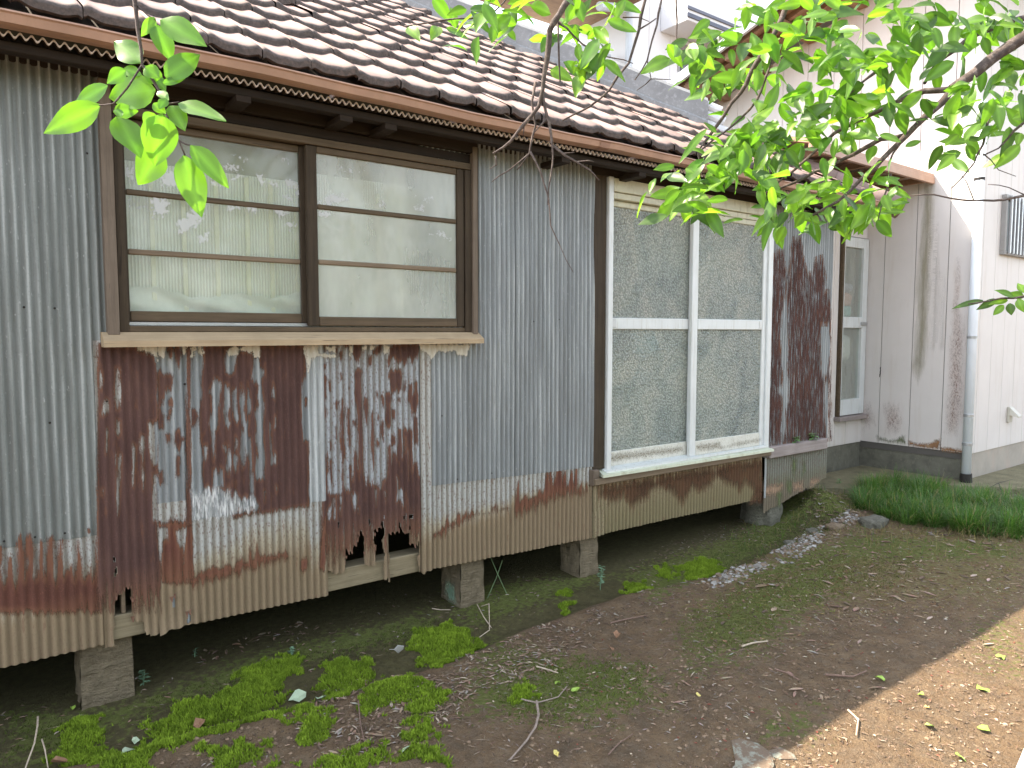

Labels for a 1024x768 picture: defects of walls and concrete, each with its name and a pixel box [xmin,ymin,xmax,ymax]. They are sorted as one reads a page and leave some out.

corrosion [769,236,832,445]
peeling [345,528,416,559]
corrosion [0,343,762,616]